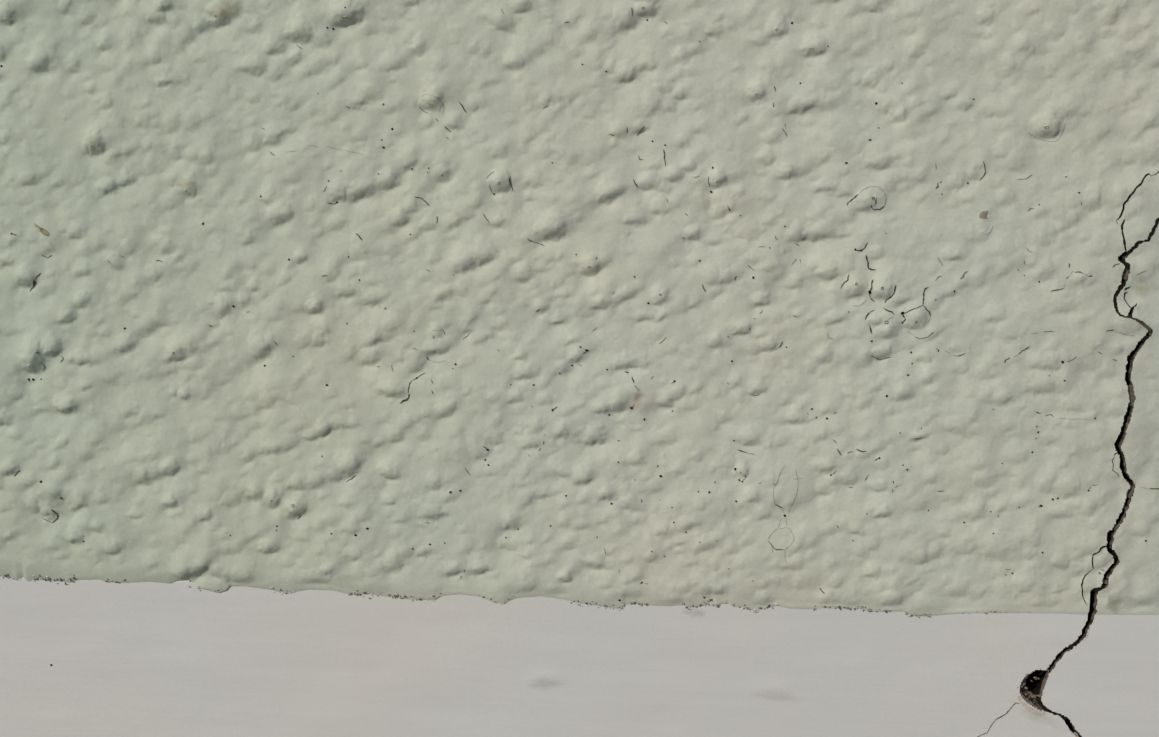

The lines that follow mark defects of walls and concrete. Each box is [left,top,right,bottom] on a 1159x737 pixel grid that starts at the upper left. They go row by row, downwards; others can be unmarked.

crack [847,186,886,210]
crack [841,244,934,360]
crack [978,171,1159,737]
crack [768,465,801,563]